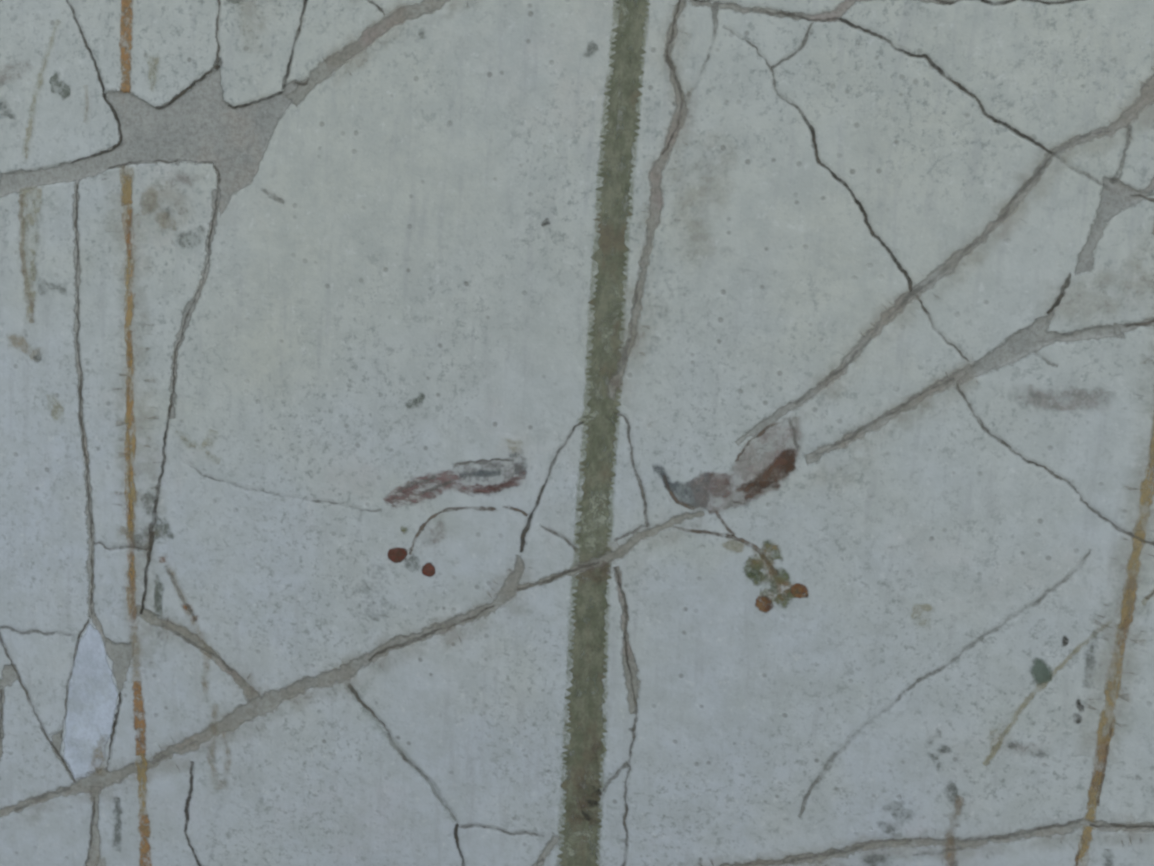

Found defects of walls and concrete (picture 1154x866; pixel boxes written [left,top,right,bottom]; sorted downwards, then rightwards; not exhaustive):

crack [156,0,220,109]
crack [228,0,309,108]
crack [666,0,1074,314]
crack [1126,319,1154,327]
crack [0,0,175,866]
crack [136,162,225,664]
crack [933,343,1154,545]
crack [518,413,649,866]
crack [349,685,385,726]
crack [184,744,201,866]
crack [454,824,560,866]
crack [995,822,1154,839]